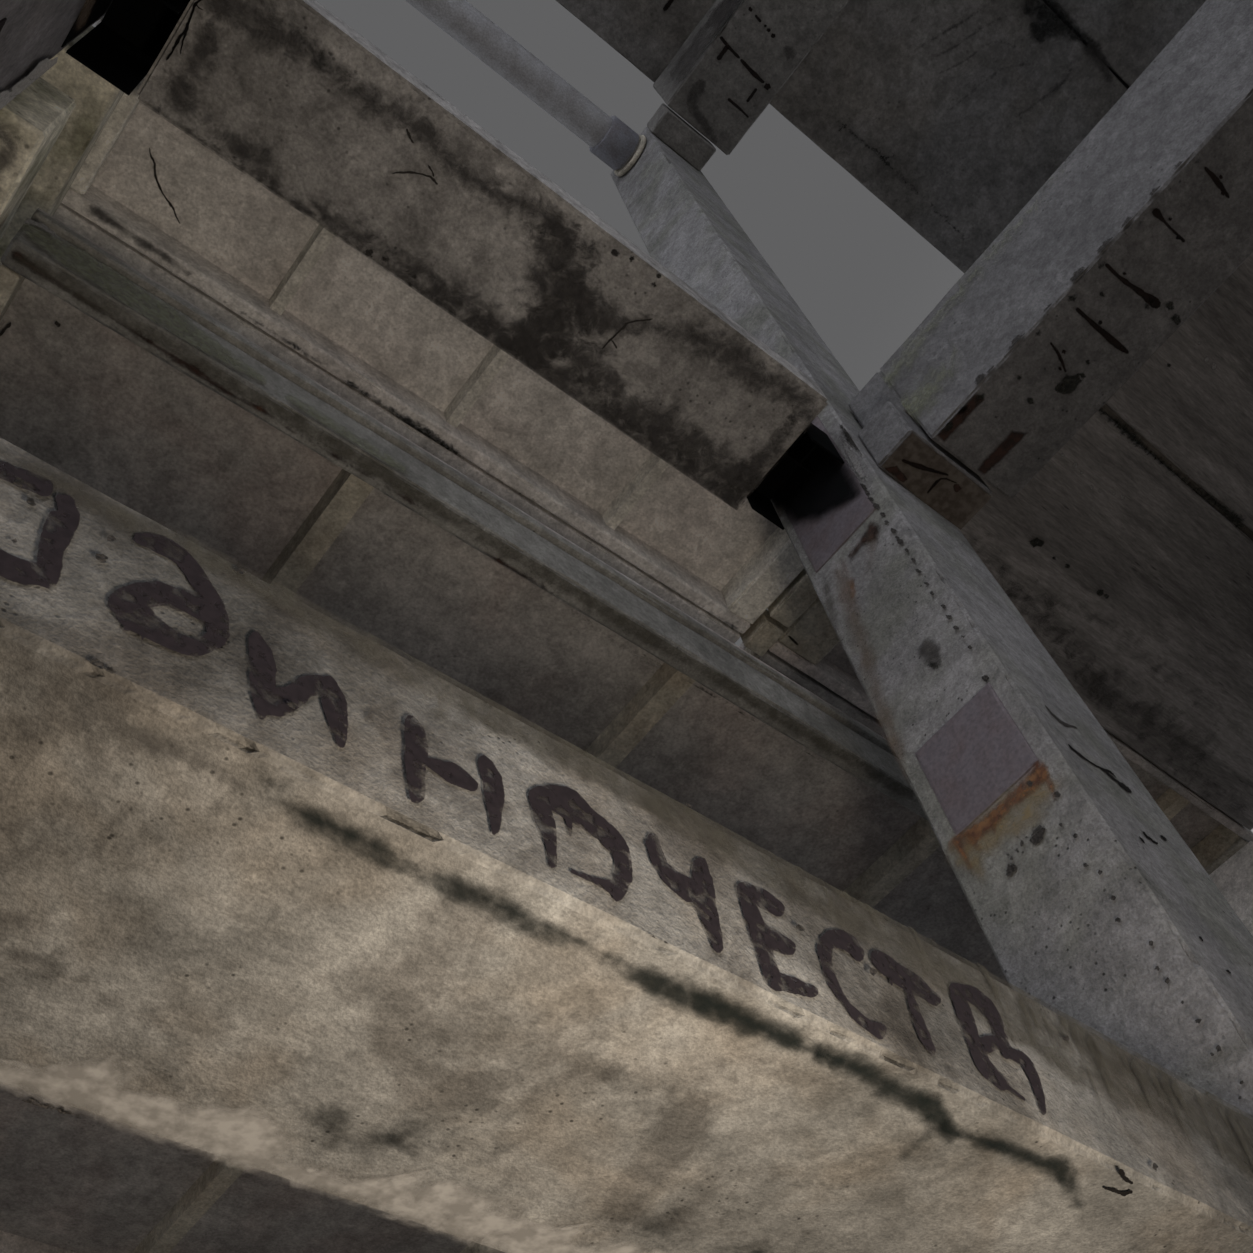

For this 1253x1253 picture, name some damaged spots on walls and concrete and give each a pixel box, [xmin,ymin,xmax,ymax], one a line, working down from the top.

crack [149,148,180,224]
water stain [169,0,812,510]
water stain [292,807,402,871]
rust [951,762,1053,870]
water stain [434,875,583,944]
water stain [629,971,1075,1189]
water stain [0,1061,659,1253]